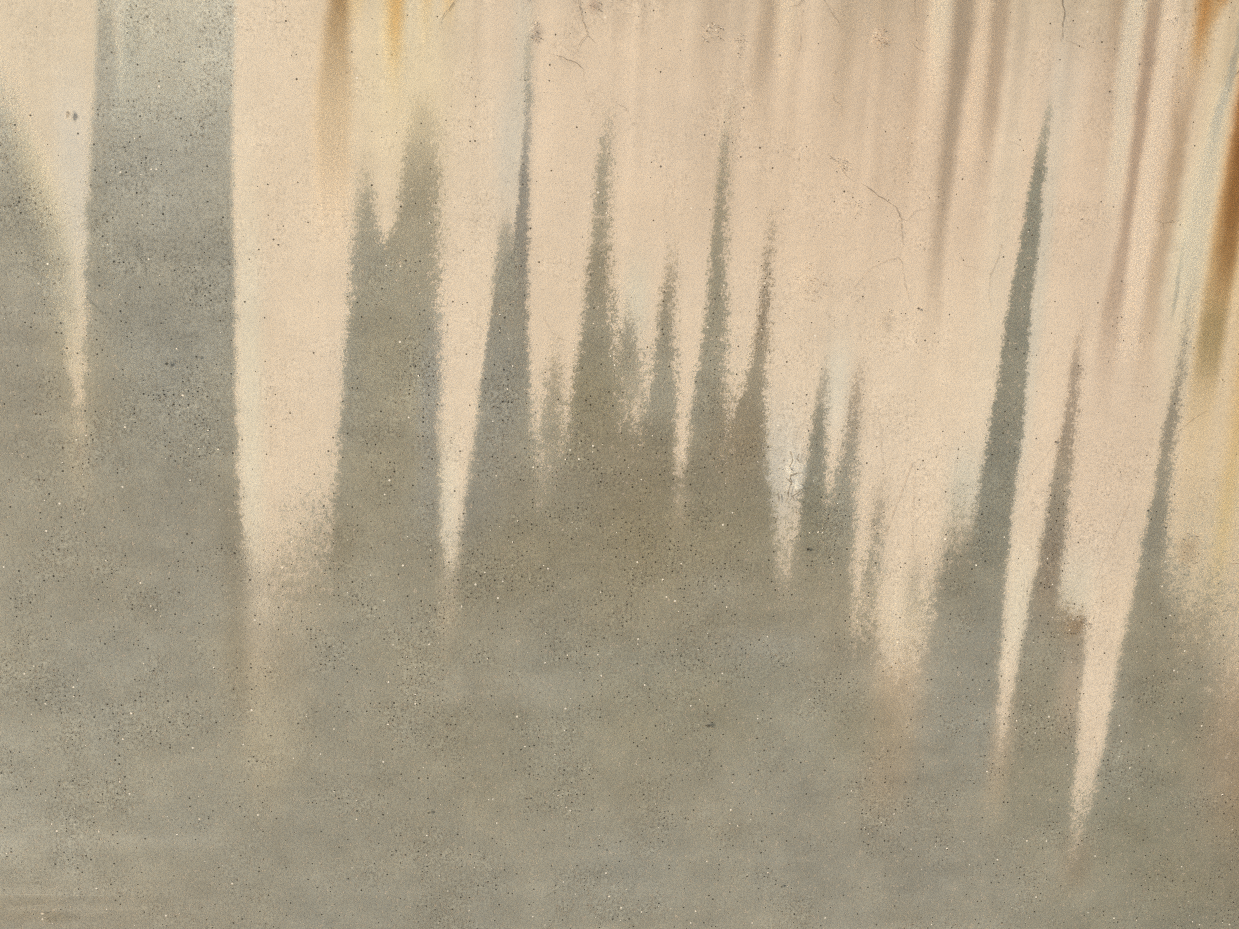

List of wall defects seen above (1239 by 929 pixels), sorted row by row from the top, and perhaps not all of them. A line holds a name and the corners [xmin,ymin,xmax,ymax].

rust [320,0,345,146]
rust [1208,98,1239,296]
water stain [862,501,889,582]